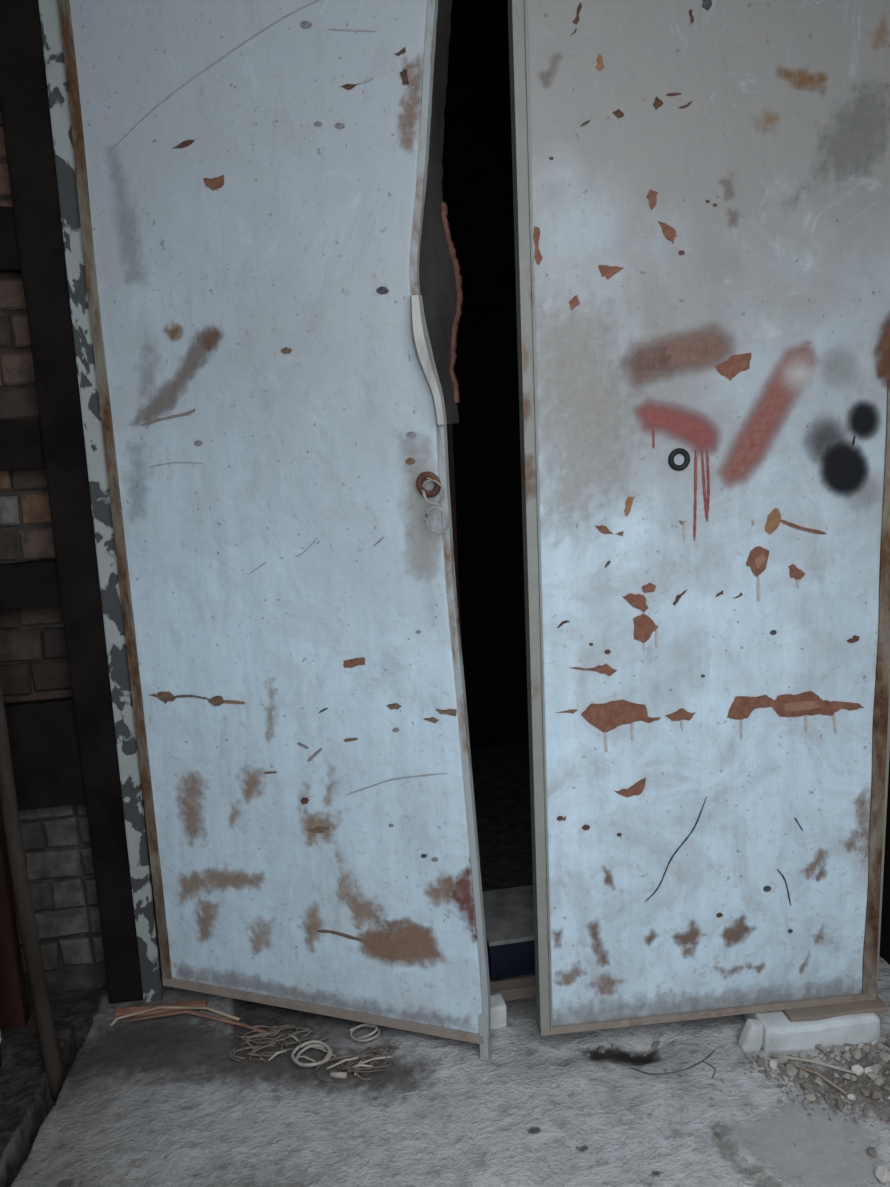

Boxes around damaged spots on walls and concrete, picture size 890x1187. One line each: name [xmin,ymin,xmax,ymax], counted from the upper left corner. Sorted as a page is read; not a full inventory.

corrosion [785,71,825,88]
corrosion [304,816,333,843]
corrosion [305,876,440,965]
corrosion [426,868,478,940]